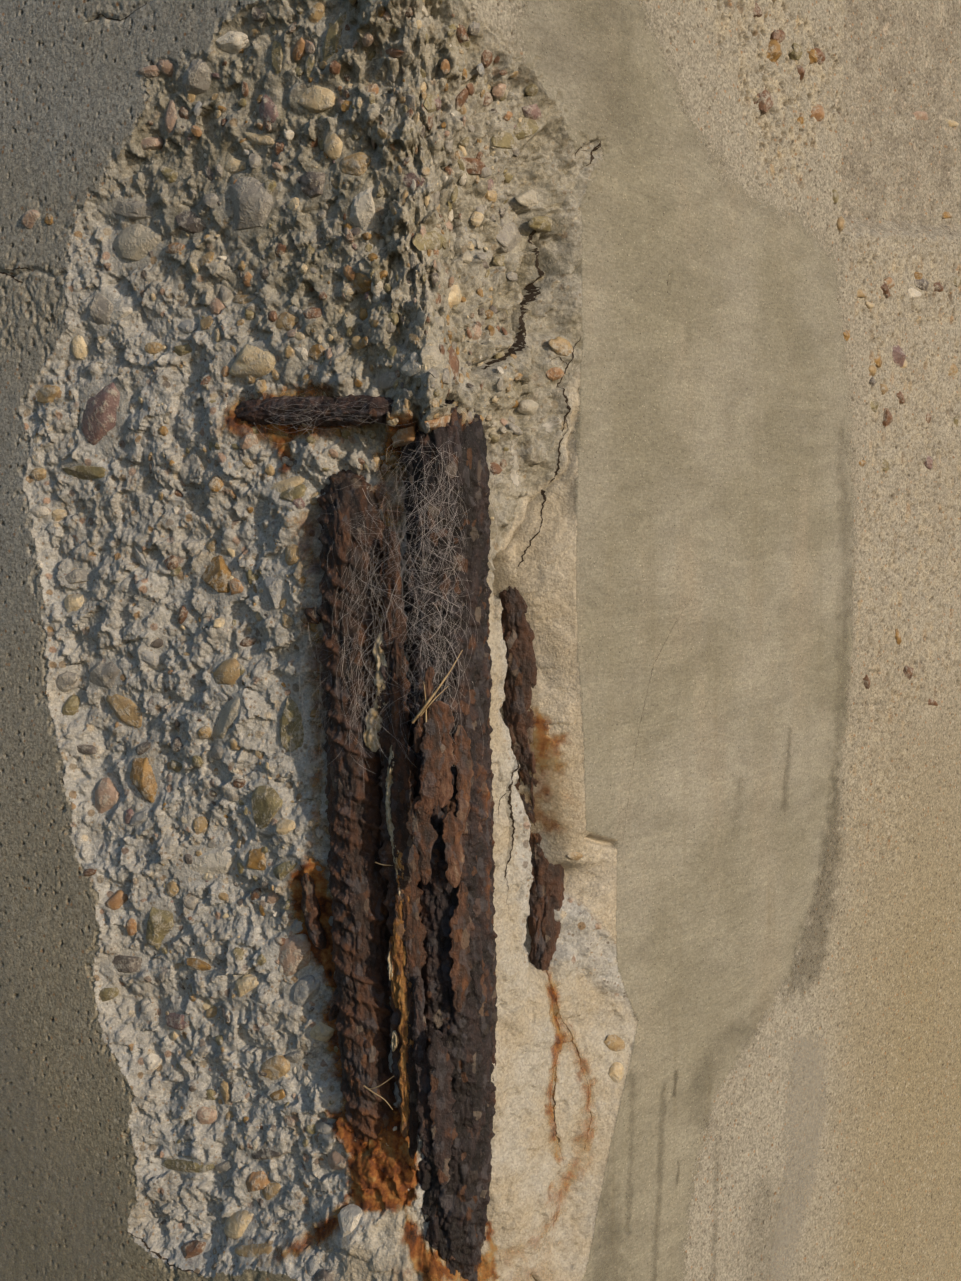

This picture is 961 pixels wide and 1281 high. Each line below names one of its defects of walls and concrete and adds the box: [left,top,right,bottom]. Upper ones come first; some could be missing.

corrosion [223,400,357,472]
corrosion [379,414,416,474]
spalling [19,0,638,1281]
corrosion [532,709,564,768]
corrosion [276,531,498,1281]